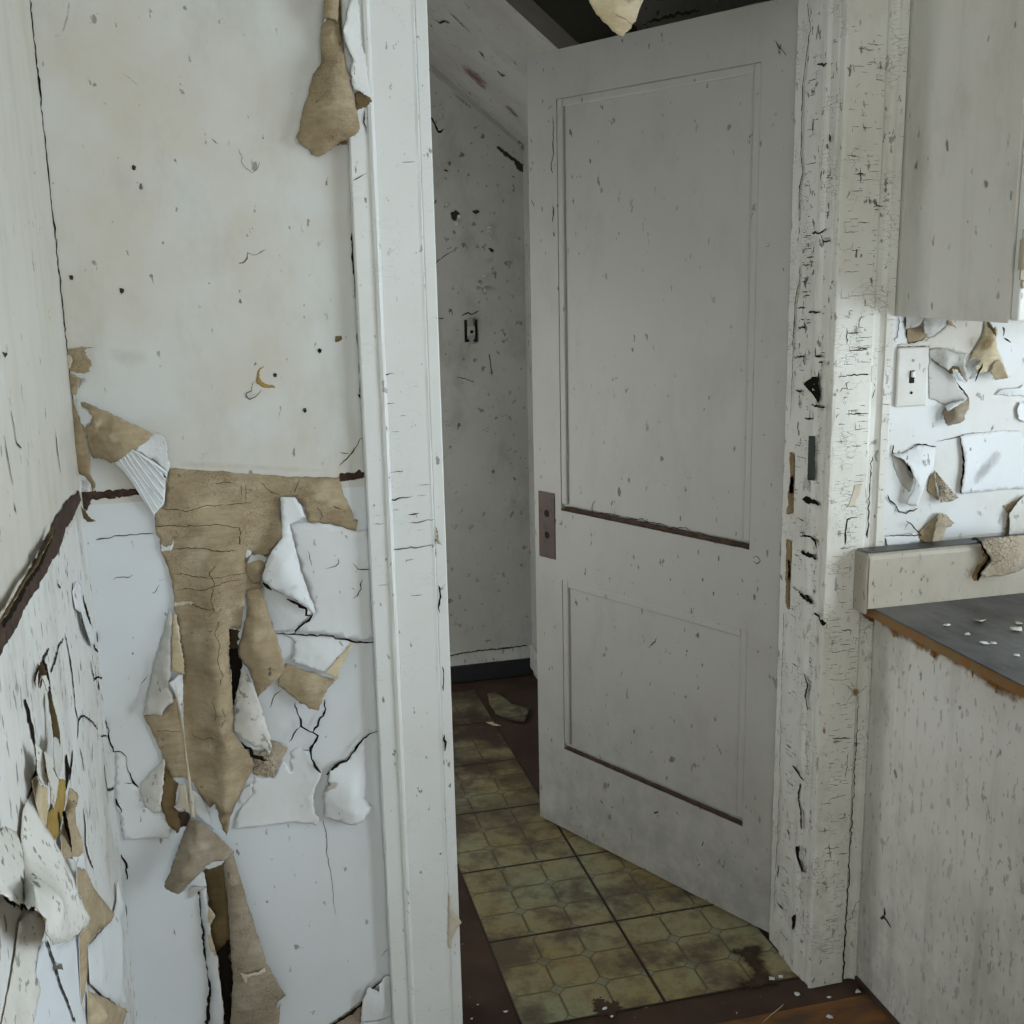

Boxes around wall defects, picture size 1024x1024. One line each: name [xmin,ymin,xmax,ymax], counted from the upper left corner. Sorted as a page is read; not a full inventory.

peeling [343,0,372,98]
peeling [589,0,643,37]
crack [773,4,985,981]
peeling [883,317,1024,581]
peeling [261,497,373,680]
peeling [143,610,185,728]
peeling [0,662,129,1024]
peeling [115,752,170,840]
crack [241,742,266,761]
peeling [233,739,371,829]
crack [270,690,378,775]
peeling [199,888,233,1024]